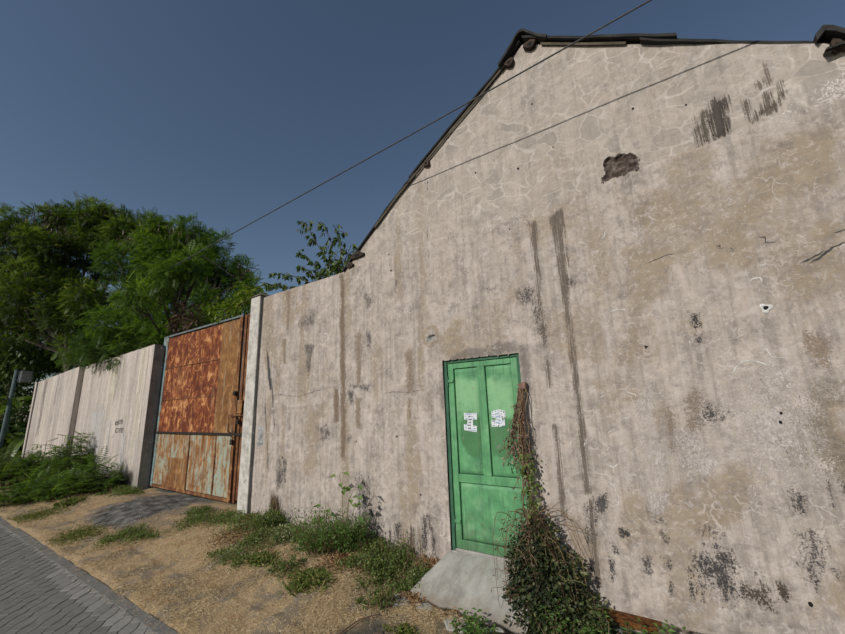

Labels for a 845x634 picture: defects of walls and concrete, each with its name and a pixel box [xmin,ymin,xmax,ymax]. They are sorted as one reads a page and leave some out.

leakage [694,95,731,147]
leakage [741,63,845,123]
spalling [597,146,645,187]
leakage [516,221,550,387]
leakage [318,274,371,458]
leakage [549,210,619,590]
spalling [828,401,845,442]
mould [688,527,789,611]